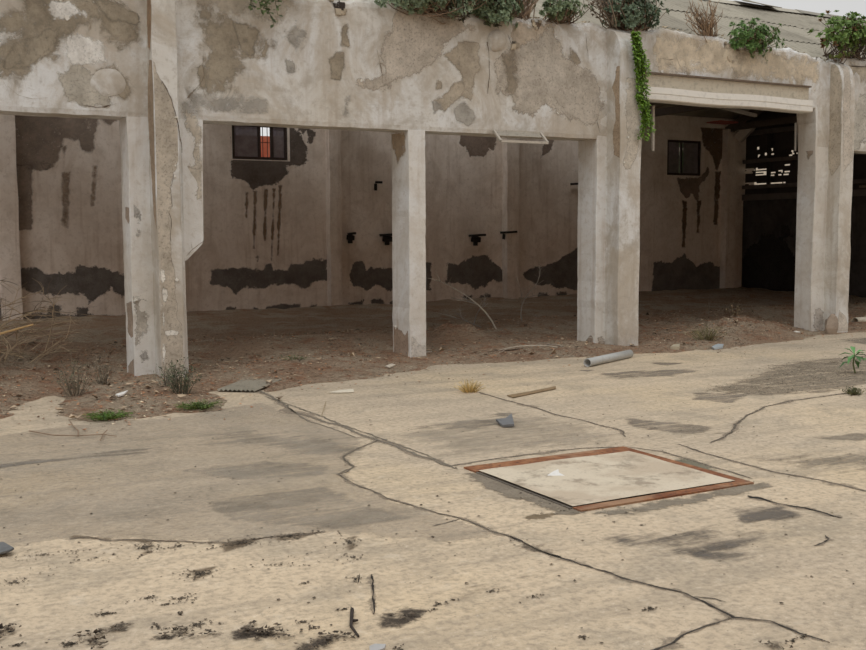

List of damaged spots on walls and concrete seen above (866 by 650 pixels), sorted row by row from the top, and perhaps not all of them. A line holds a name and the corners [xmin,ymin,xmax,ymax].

flaking render [48,0,87,21]
flaking render [59,34,111,108]
flaking render [356,6,476,91]
flaking render [494,19,620,158]
water stain [15,115,116,230]
water stain [21,265,148,345]
flaking render [148,60,184,378]
water stain [210,186,327,295]
water stain [349,261,393,305]
water stain [523,248,578,297]
crack [70,531,326,544]
crack [256,390,866,650]